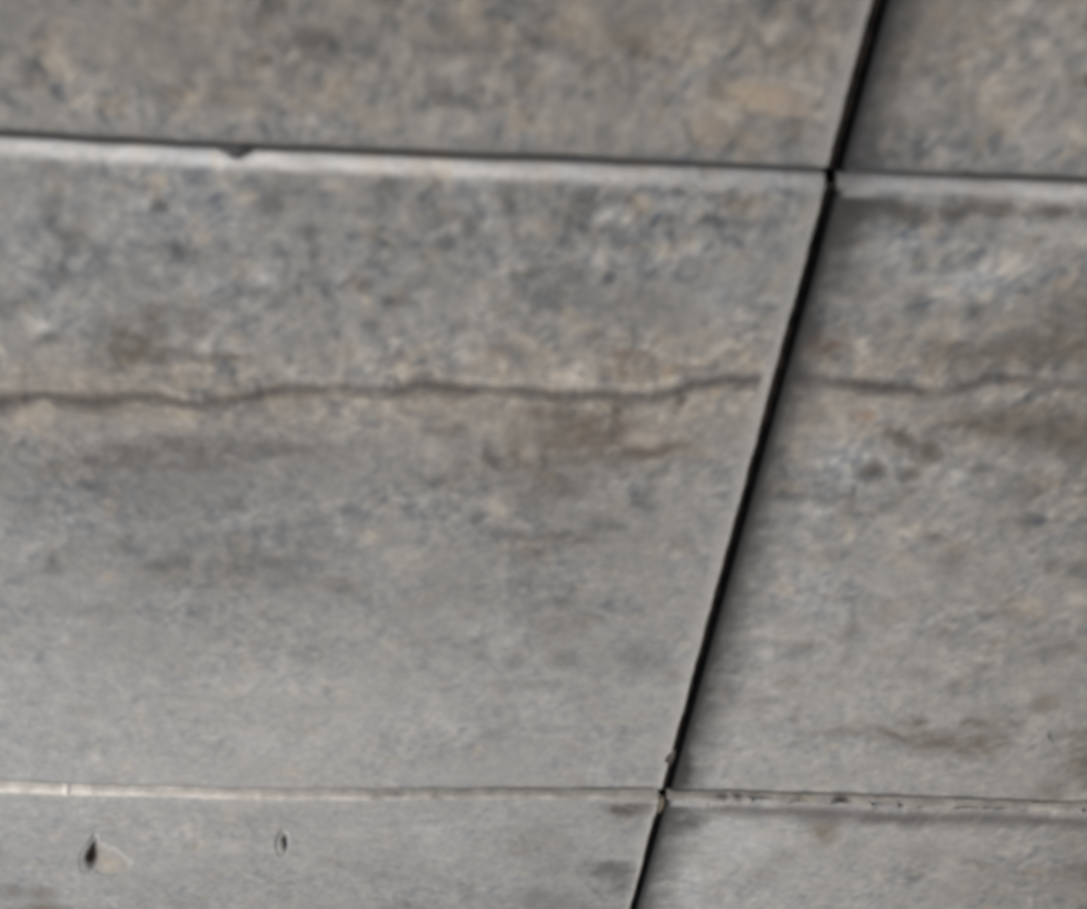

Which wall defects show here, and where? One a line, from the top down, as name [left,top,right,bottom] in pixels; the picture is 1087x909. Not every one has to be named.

crack [0,366,1087,417]